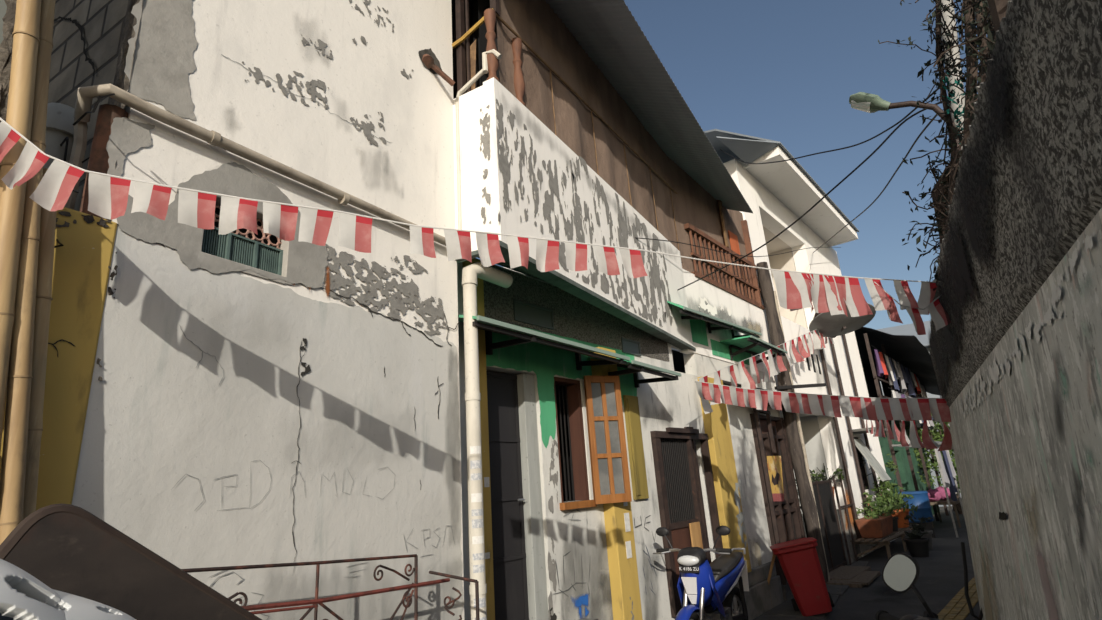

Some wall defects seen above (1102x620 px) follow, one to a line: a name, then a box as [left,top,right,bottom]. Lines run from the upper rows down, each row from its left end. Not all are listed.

peeling [349,0,394,32]
spalling [0,0,17,122]
flaking render [124,0,198,120]
peeling [242,61,329,108]
peeling [301,35,333,59]
flaking render [106,117,155,177]
peeling [350,112,386,146]
peeling [479,99,673,327]
peeling [325,244,449,336]
crack [180,326,224,385]
crack [292,342,306,573]